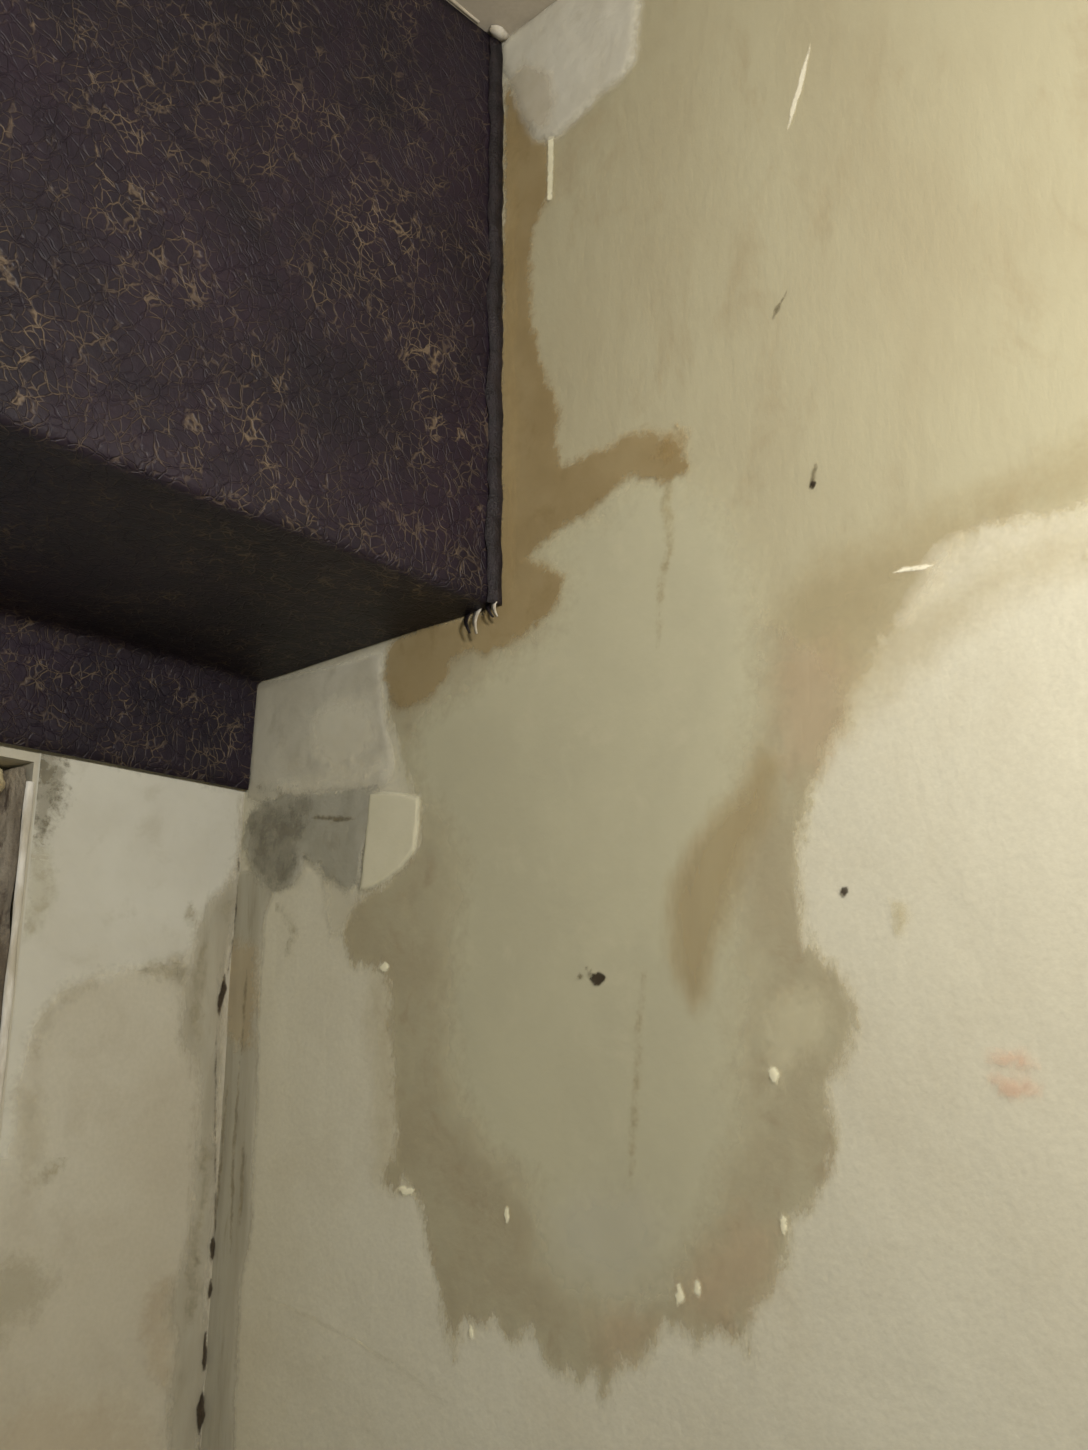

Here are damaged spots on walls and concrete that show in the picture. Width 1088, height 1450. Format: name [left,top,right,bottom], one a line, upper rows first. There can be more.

peeling [360,793,418,889]
leakage [345,90,859,1395]
peeling [507,0,1088,761]